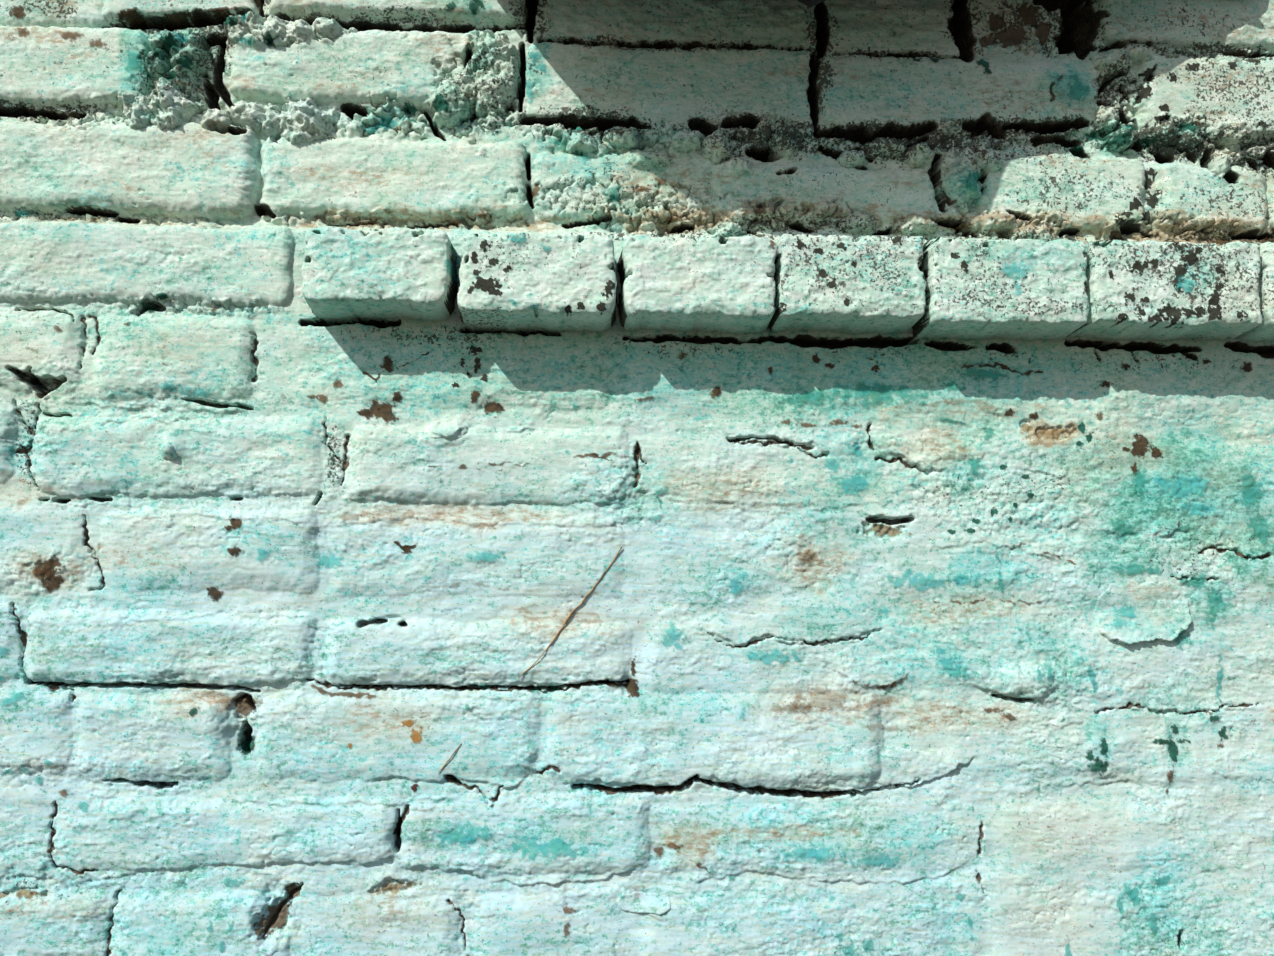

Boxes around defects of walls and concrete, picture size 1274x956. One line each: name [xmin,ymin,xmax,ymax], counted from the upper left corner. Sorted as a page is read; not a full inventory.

peeling [1114,168,1163,228]
peeling [467,239,511,295]
peeling [1105,242,1249,338]
leakage [1122,433,1215,516]
leakage [1235,473,1269,544]
leakage [1115,563,1161,575]
crack [1170,546,1271,581]
leakage [1179,571,1230,629]
crack [1095,702,1258,714]
crack [445,775,503,802]
crack [537,765,918,799]
spalling [254,883,302,940]